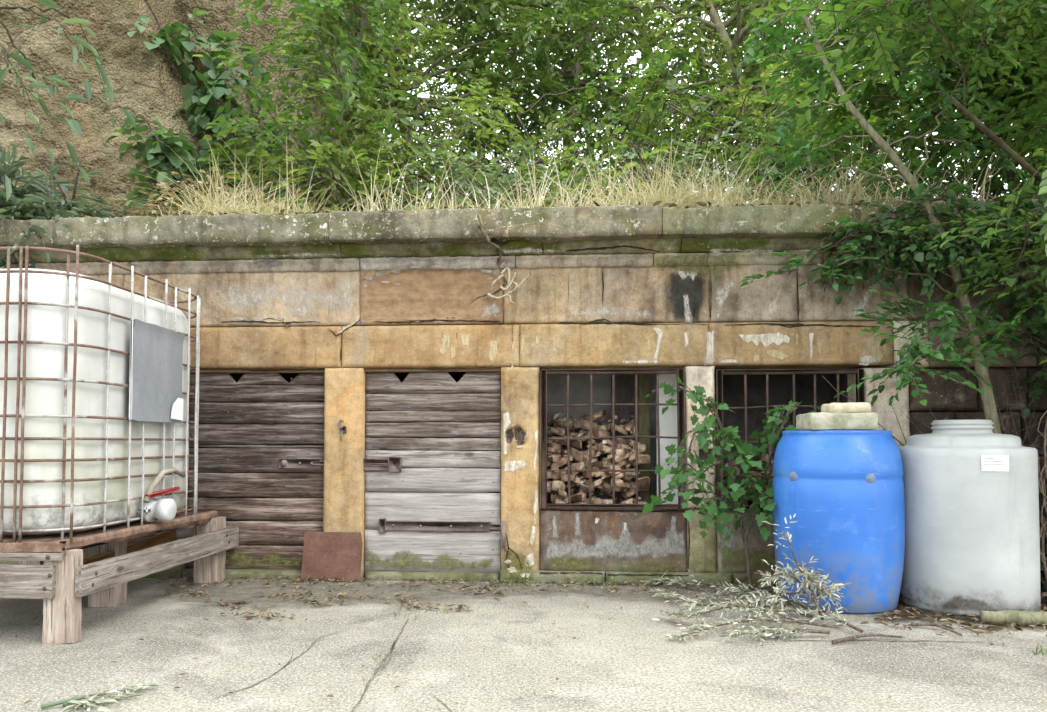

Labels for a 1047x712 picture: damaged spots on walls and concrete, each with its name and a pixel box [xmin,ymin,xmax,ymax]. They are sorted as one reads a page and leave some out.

water stain [666,271,704,346]
crack [221,316,513,366]
water stain [706,331,737,364]
peeling [739,332,790,362]